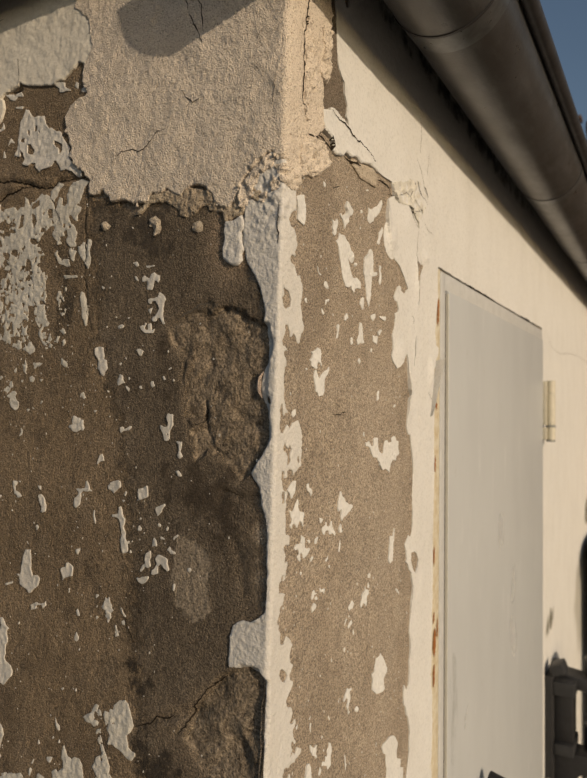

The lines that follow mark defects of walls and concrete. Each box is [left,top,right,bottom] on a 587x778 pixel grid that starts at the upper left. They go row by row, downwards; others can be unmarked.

water stain [124,207,173,257]
crack [185,0,203,43]
crack [302,0,433,258]
peeling [0,63,271,778]
peeling [277,0,427,778]
crack [135,676,226,735]